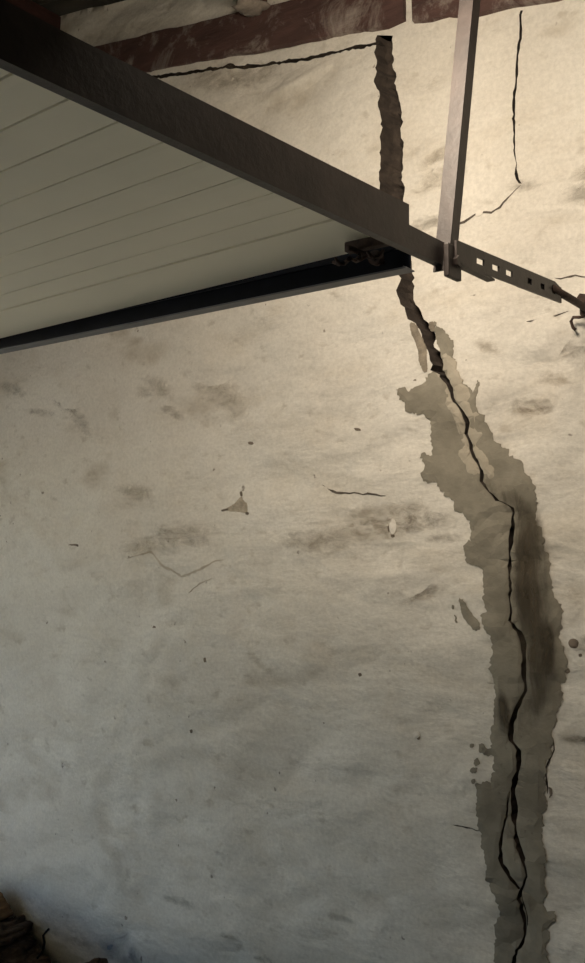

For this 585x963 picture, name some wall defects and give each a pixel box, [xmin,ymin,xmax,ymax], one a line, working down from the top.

crack [153,35,405,201]
crack [460,11,522,224]
flaking render [410,321,435,381]
flaking render [221,491,249,515]
crack [323,485,384,496]
crack [127,551,224,593]
crack [396,261,528,963]
peeling [452,598,480,631]
peeling [470,743,492,784]
crack [545,742,555,793]